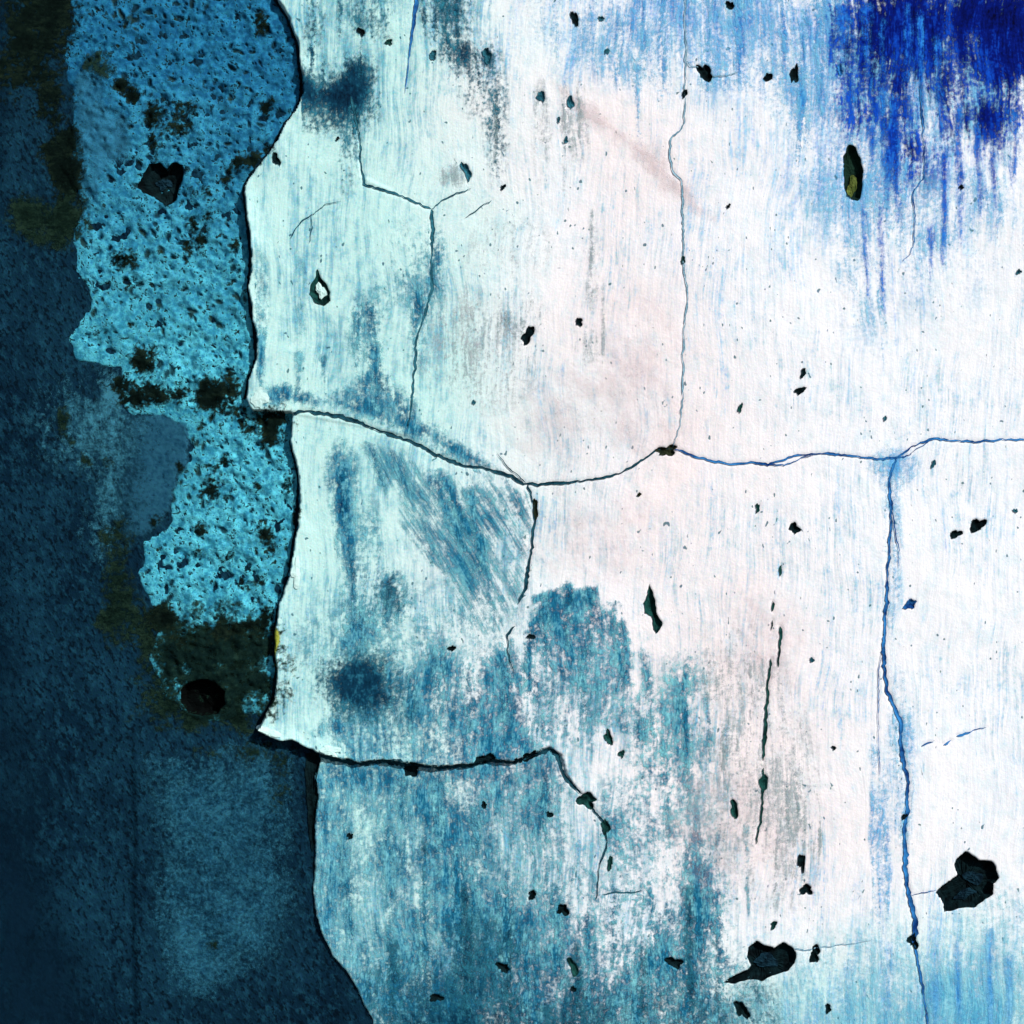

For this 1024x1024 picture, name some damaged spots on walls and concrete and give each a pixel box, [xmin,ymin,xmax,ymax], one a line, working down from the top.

spalling [62,0,303,639]
crack [242,0,303,399]
peeling [316,282,327,299]
spalling [149,631,191,710]
leakage [47,344,297,994]
spalling [242,656,282,737]
crack [257,440,299,726]
leakage [284,477,302,526]
peeling [319,745,341,757]
crack [291,0,1024,1024]